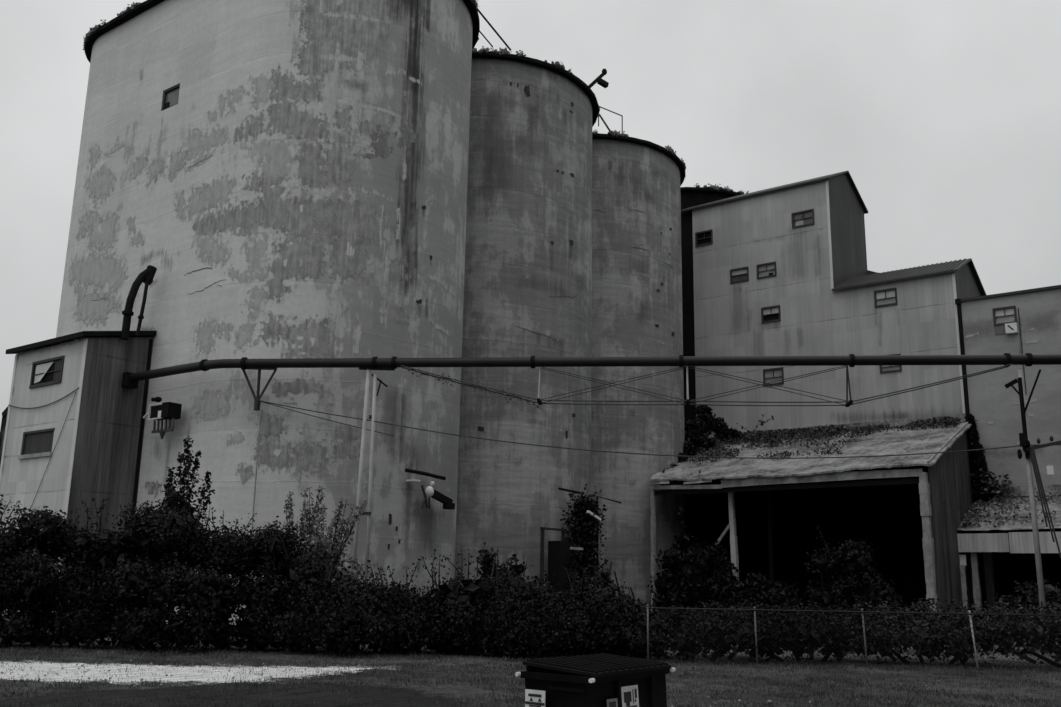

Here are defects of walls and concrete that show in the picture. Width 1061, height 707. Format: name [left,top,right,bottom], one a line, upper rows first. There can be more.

peeling [18,0,417,359]
damp [278,0,455,330]